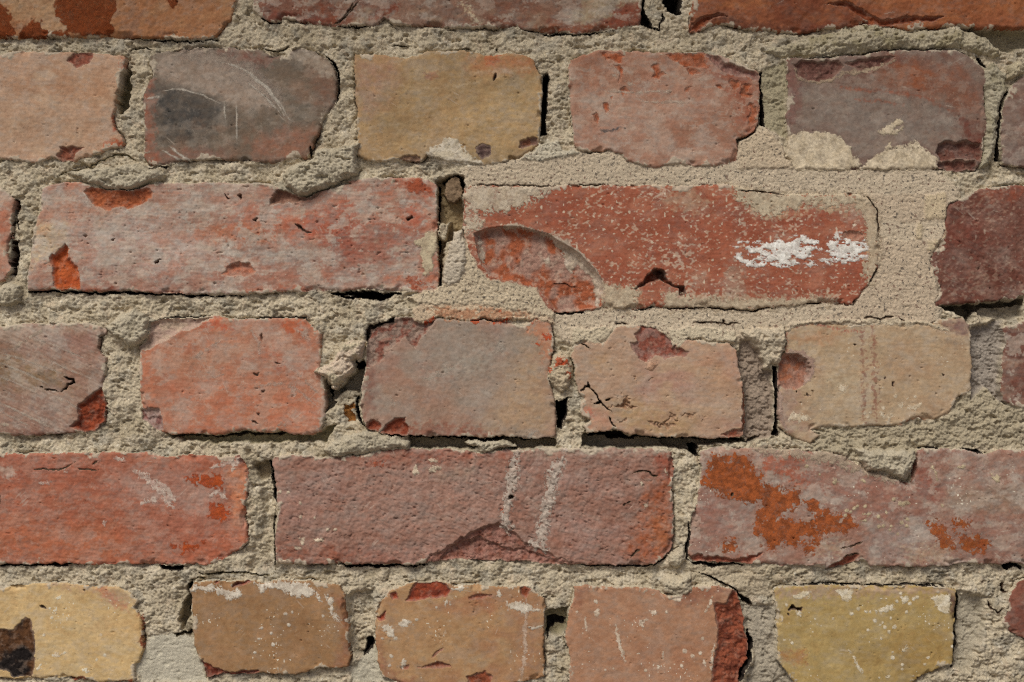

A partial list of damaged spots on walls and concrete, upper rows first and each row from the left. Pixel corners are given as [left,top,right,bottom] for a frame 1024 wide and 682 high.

spalling [936,140,983,173]
spalling [474,227,604,312]
spalling [69,388,108,432]
crack [581,382,616,427]
spalling [0,617,35,678]
spalling [711,590,748,682]